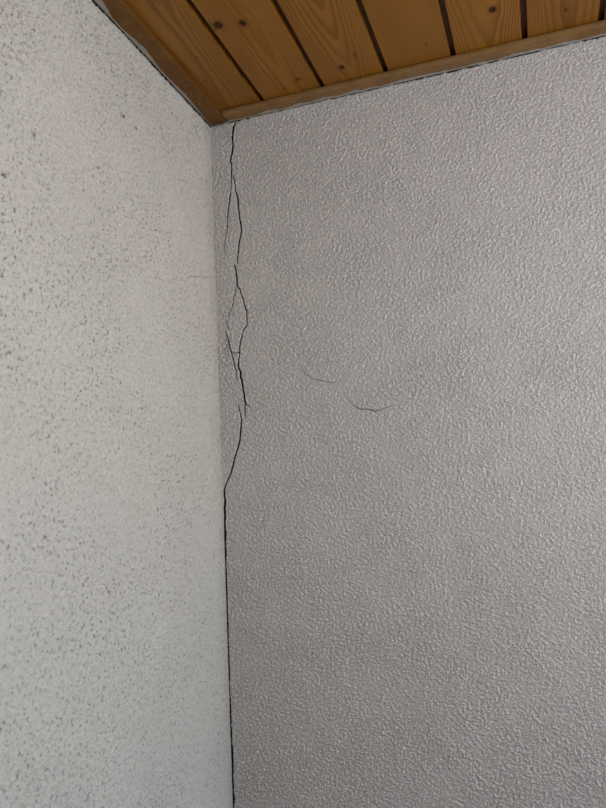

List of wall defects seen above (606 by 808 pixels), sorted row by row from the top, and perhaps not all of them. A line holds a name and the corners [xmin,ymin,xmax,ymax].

crack [92,0,326,808]
crack [332,35,606,99]